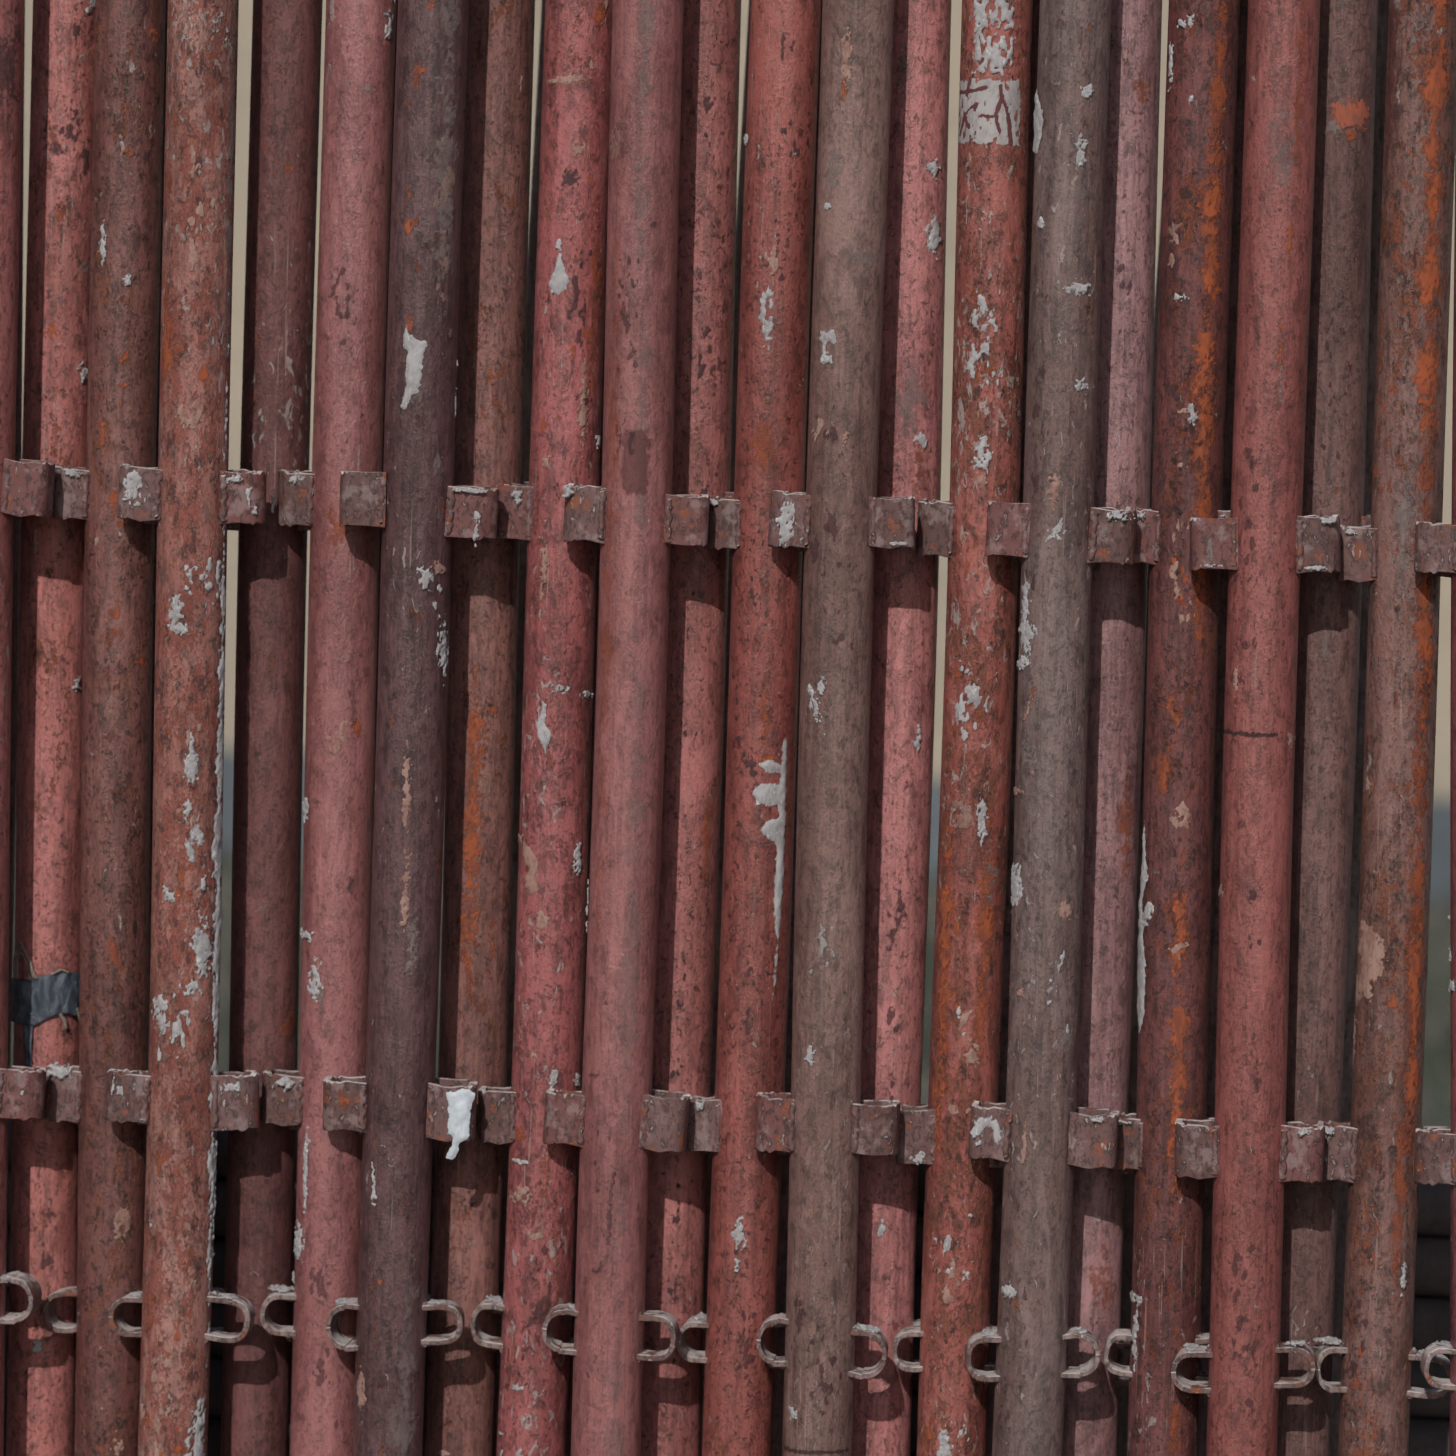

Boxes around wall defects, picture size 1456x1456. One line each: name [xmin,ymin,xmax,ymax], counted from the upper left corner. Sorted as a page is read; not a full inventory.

peeling [980,340,1045,399]
corrosion [1188,4,1228,518]
corrosion [1401,0,1450,522]
corrosion [930,771,995,1152]
corrosion [1155,746,1171,793]
corrosion [1159,893,1191,1194]
corrosion [1171,556,1209,665]
corrosion [1372,572,1435,1300]